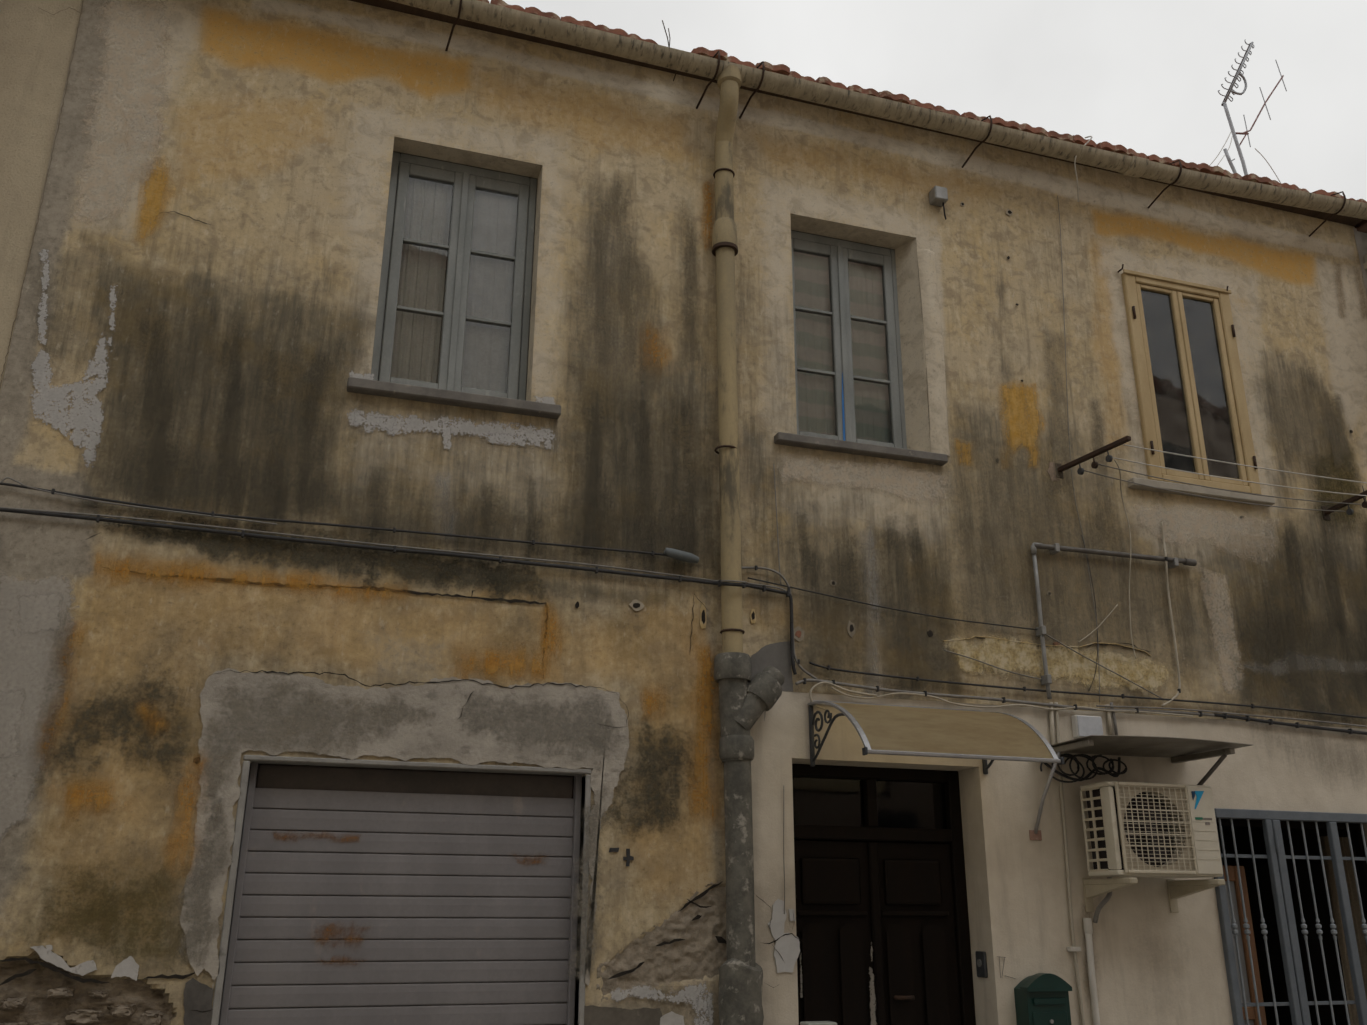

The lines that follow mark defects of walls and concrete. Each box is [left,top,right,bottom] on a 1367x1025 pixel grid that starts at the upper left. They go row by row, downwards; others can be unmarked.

peeling [31,249,118,468]
peeling [347,408,555,449]
leakage [46,678,426,961]
leakage [571,724,692,975]
spalling [0,945,195,1025]
flaking render [596,879,727,1025]
peeling [768,899,803,998]
peeling [869,943,877,1025]